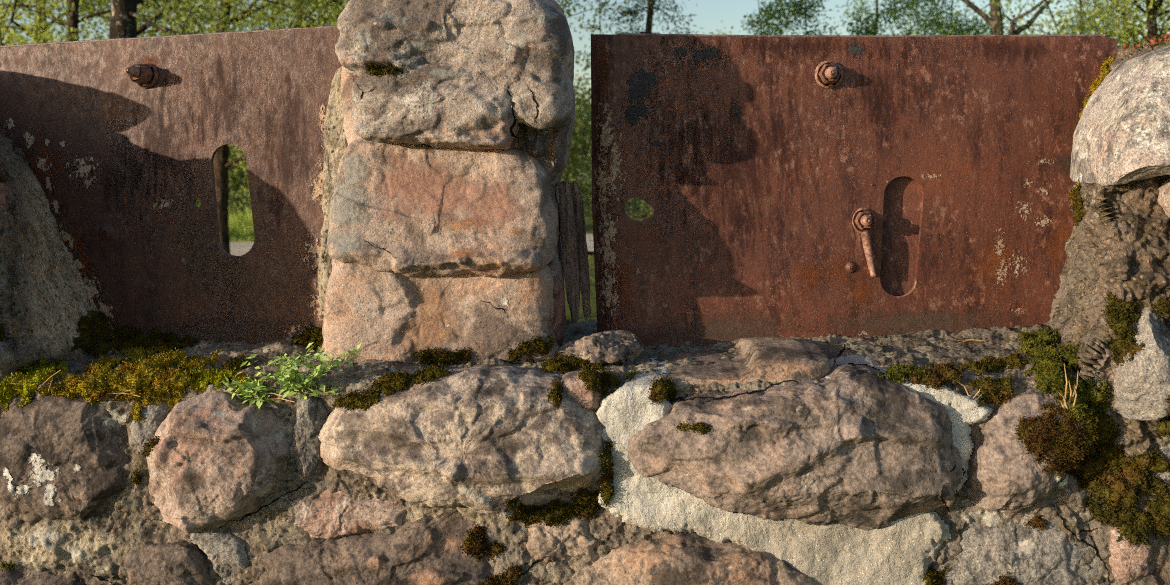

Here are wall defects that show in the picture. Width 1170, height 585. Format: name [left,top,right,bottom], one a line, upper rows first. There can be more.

crack [507,83,538,146]
peeling [4,117,114,321]
peeling [310,162,323,208]
peeling [593,63,658,318]
peeling [284,233,323,337]
crack [666,380,797,403]